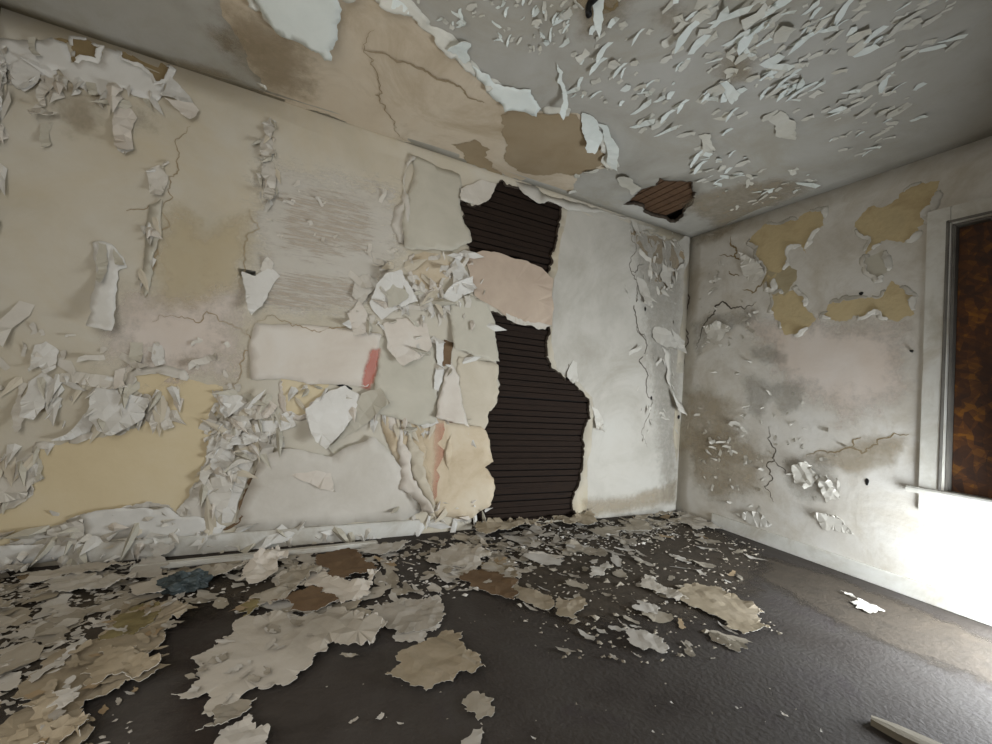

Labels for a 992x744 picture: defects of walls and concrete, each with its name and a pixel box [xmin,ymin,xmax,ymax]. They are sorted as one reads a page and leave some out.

peeling [55,35,104,64]
peeling [116,50,176,86]
crack [363,31,484,142]
peeling [220,0,968,313]
peeling [0,301,45,371]
crack [685,237,768,347]
peeling [702,181,943,347]
peeling [0,353,329,561]
flaking render [472,311,605,529]
water stain [685,397,756,493]
crack [764,433,786,500]
crack [806,433,909,457]